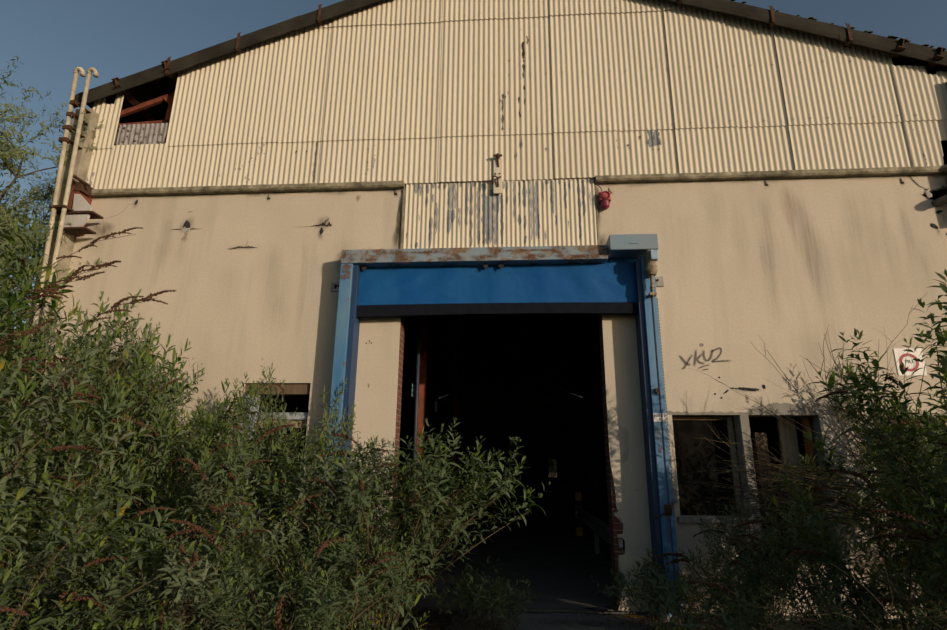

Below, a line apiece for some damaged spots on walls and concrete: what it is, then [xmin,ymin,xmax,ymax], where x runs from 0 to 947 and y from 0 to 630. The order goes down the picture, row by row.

peeling [617,129,662,150]
peeling [415,179,591,246]
corrosion [521,247,606,259]